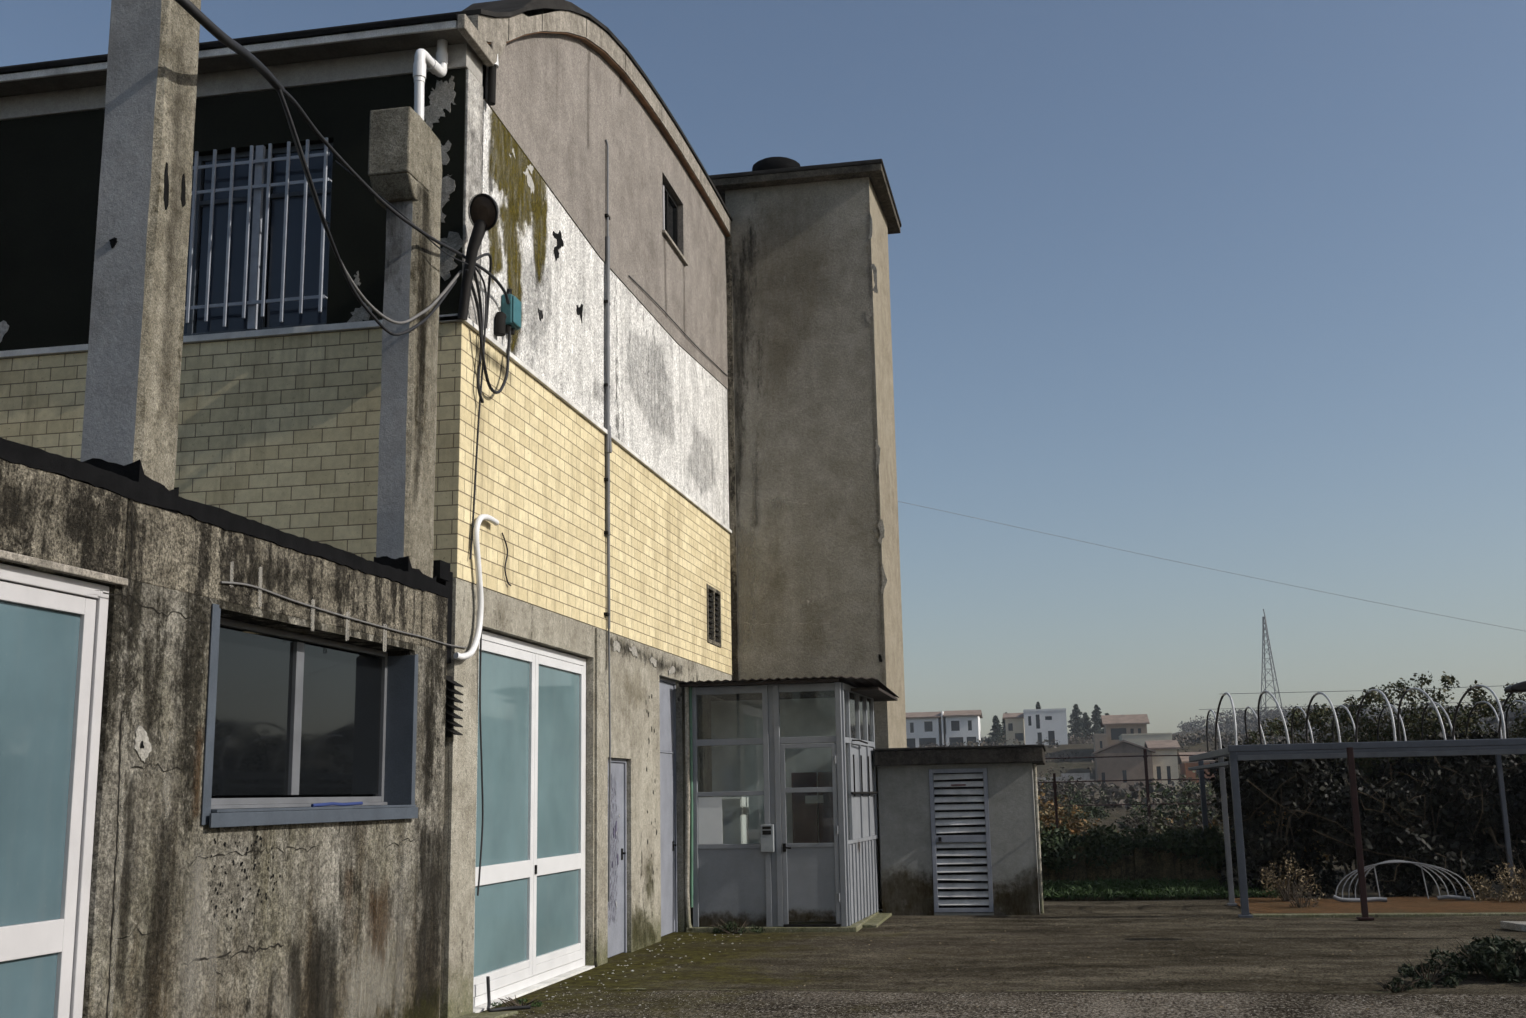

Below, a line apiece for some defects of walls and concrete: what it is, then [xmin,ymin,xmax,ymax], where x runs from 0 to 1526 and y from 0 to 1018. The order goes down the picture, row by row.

peeling [424,75,456,129]
peeling [347,303,372,330]
peeling [440,140,464,281]
leakage [475,171,548,375]
spalling [552,230,564,261]
leakage [733,228,758,640]
leakage [0,469,152,738]
leakage [230,545,348,629]
spalling [133,726,152,763]
leakage [117,782,134,985]
leakage [145,830,170,995]
leakage [270,692,443,1018]